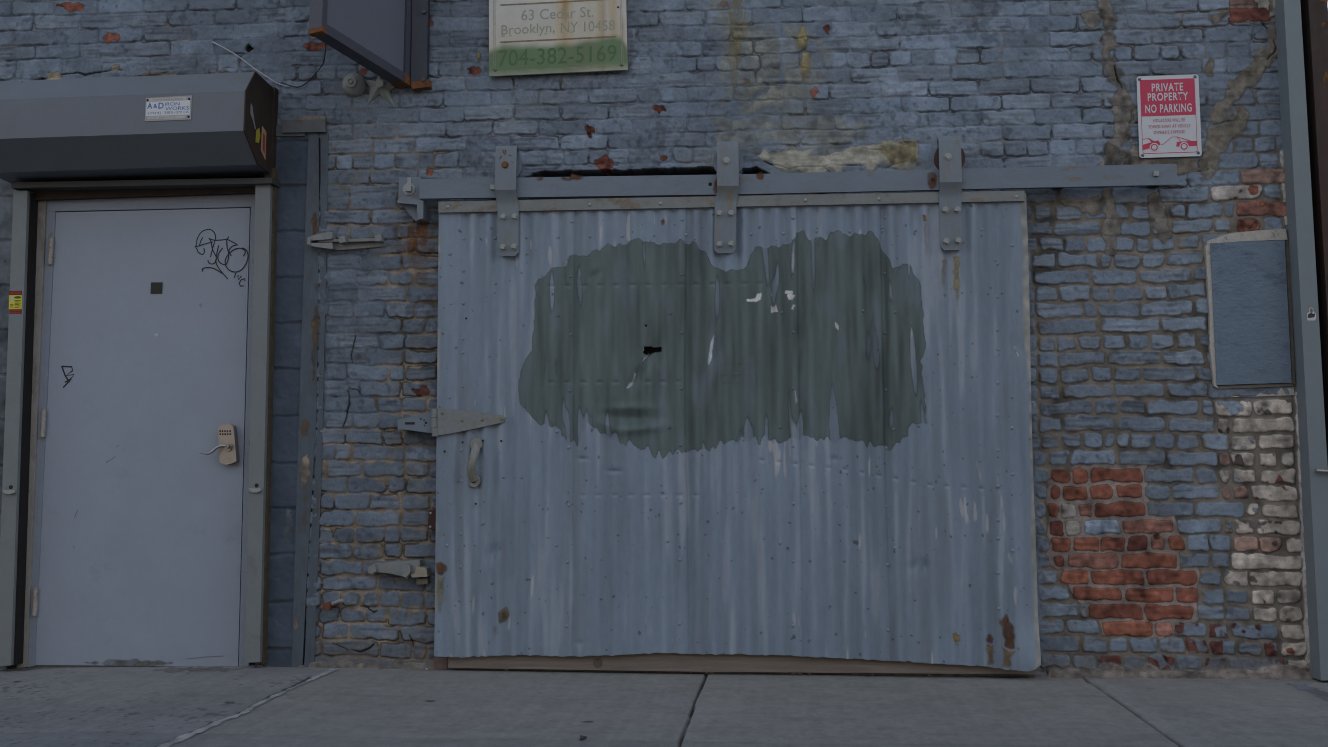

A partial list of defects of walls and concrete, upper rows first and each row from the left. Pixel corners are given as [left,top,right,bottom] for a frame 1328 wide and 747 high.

damp [712,0,919,173]
crack [1081,0,1140,165]
spalling [1228,0,1276,25]
peeling [1046,392,1310,671]
corrosion [987,616,1015,666]